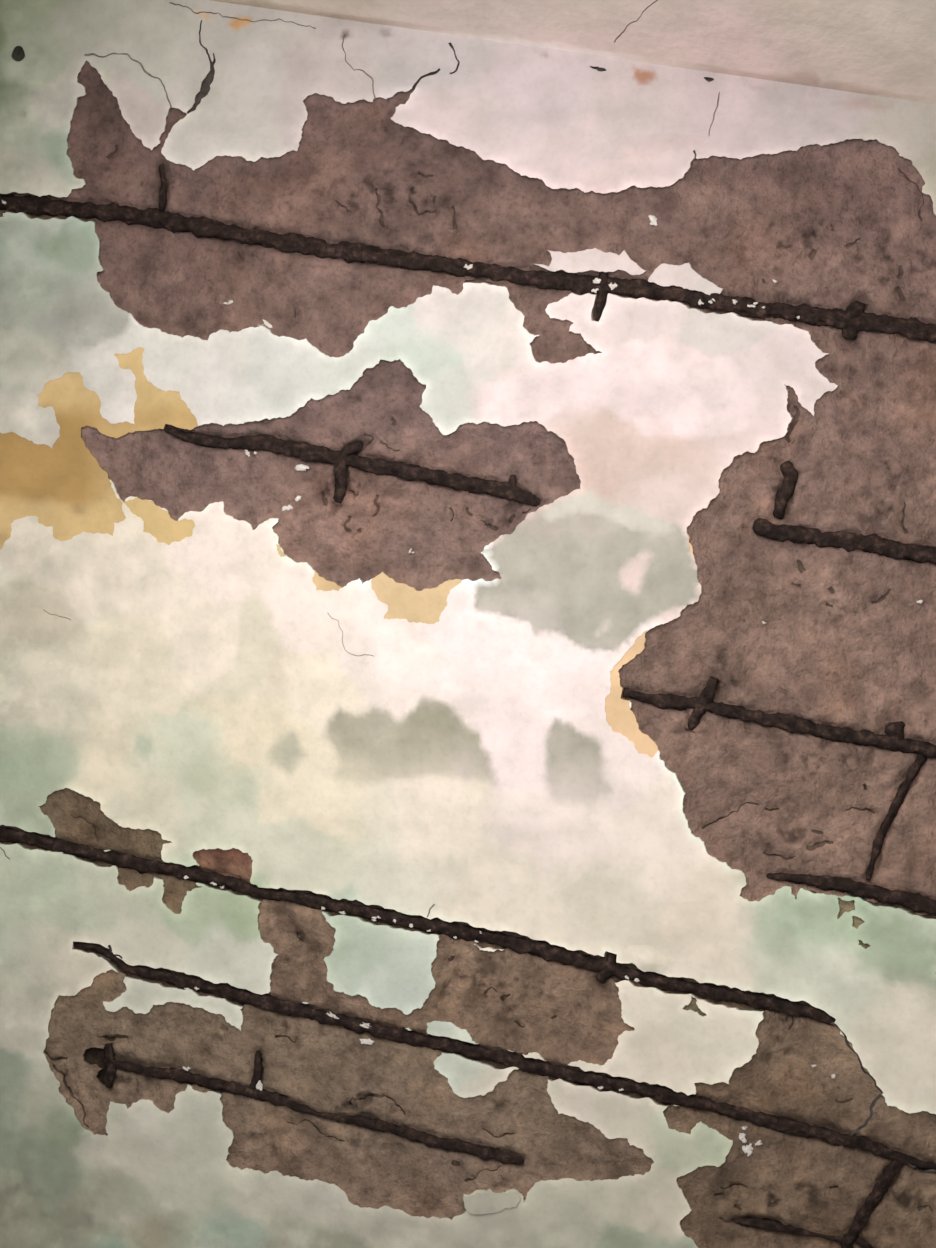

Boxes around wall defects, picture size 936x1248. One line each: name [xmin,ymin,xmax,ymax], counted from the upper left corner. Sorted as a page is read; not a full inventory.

crack [84,2,376,114]
crack [590,0,658,72]
spalling [0,61,936,949]
spalling [44,890,654,1219]
spalling [664,1010,936,1248]